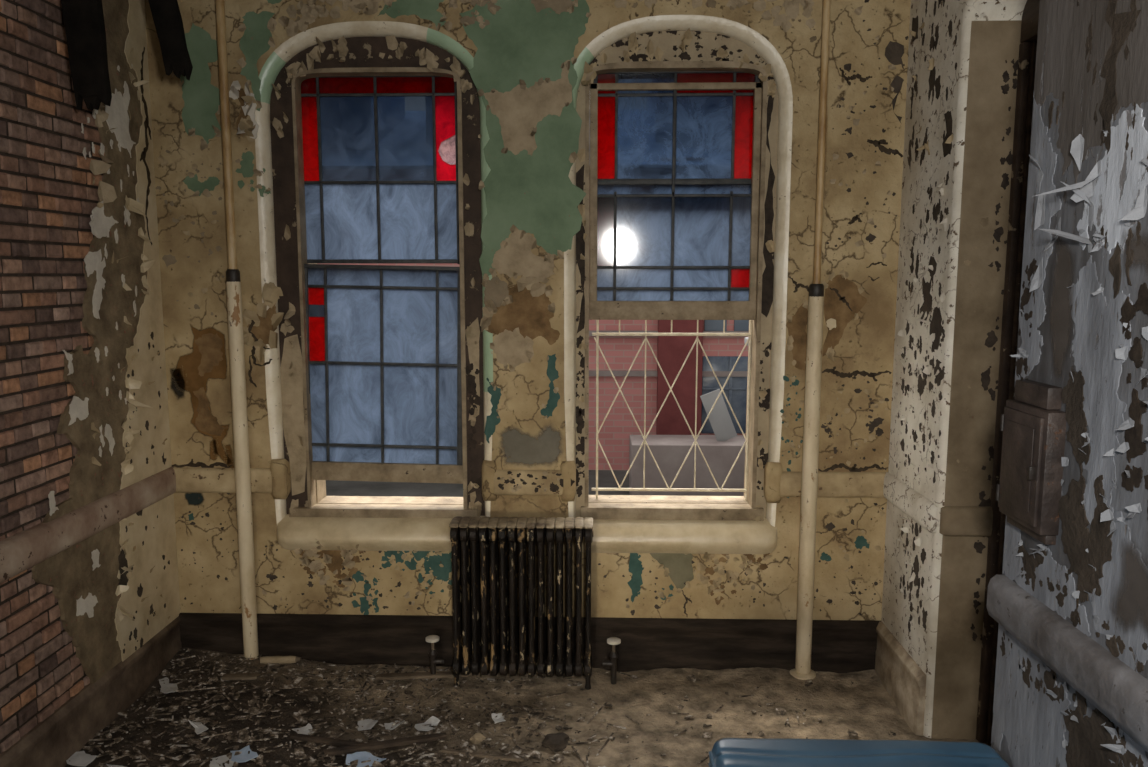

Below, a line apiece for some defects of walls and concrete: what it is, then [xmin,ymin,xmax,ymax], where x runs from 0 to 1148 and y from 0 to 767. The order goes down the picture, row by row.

crack [839,68,872,86]
crack [867,139,903,157]
peeling [81,64,155,330]
crack [848,215,862,225]
peeling [171,0,776,521]
crack [789,276,852,311]
crack [866,262,887,281]
peeling [1010,0,1148,627]
crack [822,367,892,381]
peeling [294,539,452,615]
spalling [896,516,927,632]
spalling [1000,631,1144,767]